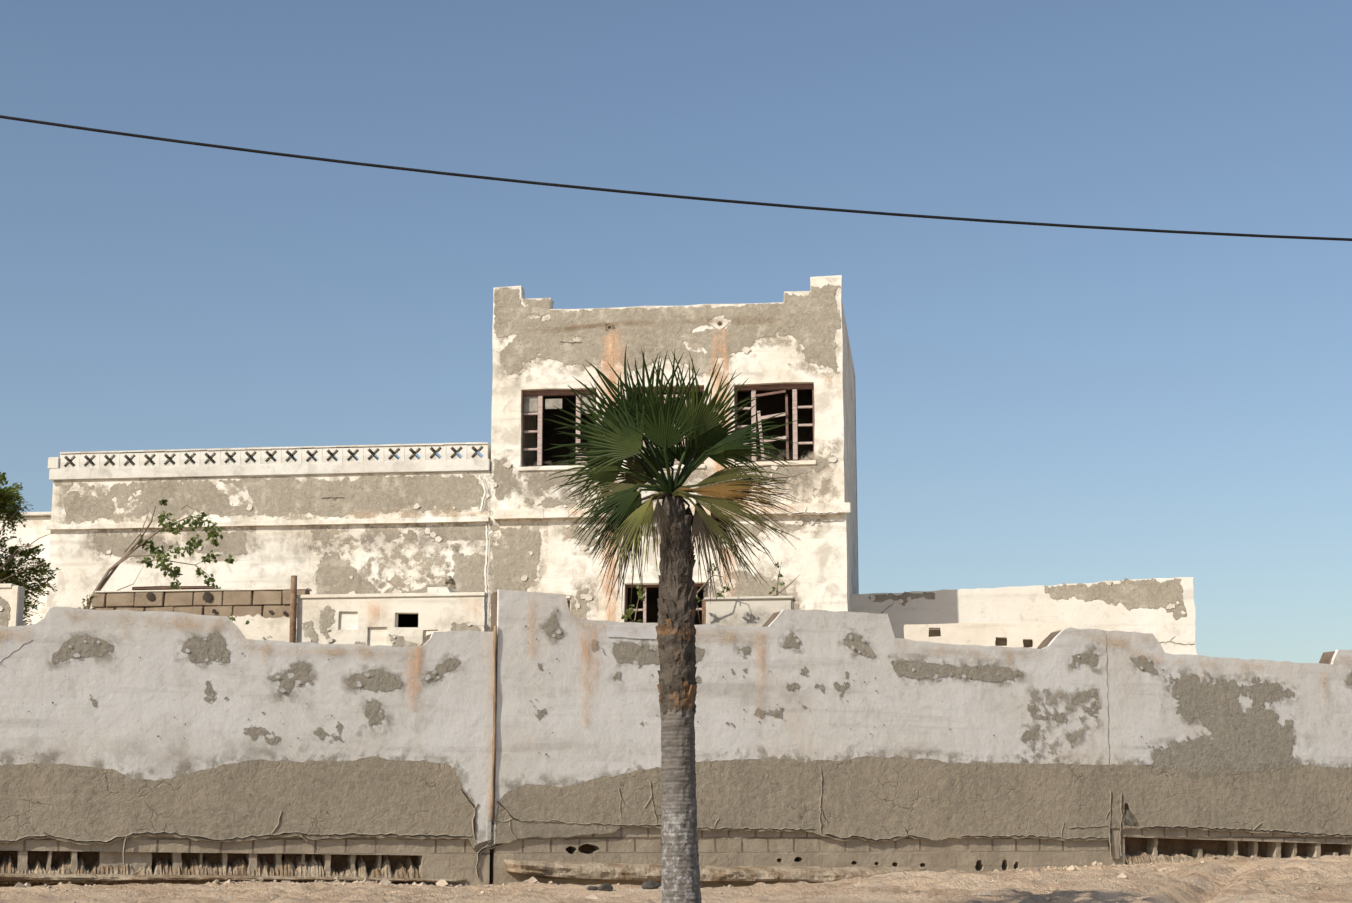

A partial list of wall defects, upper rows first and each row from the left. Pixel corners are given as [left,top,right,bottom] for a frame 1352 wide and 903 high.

rust [601,333,621,404]
peeling [494,284,841,379]
peeling [691,442,837,553]
peeling [48,458,622,703]
peeling [1044,578,1187,620]
crack [0,639,33,666]
peeling [590,639,660,682]
flaking render [695,632,1352,865]
crack [697,634,1352,858]
flaking render [0,712,477,887]
crack [0,781,661,878]
flaking render [490,766,662,854]